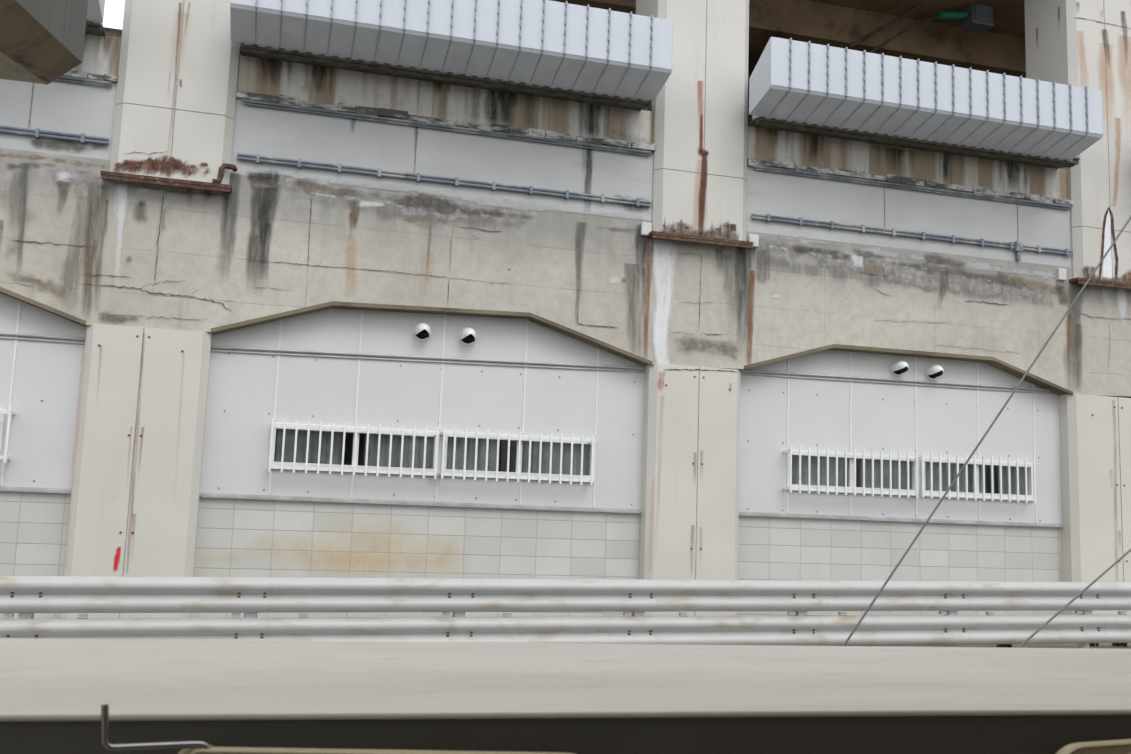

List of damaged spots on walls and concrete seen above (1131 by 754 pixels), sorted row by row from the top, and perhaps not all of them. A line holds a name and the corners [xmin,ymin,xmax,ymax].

water stain [487,90,531,123]
corrosion [114,151,208,175]
crack [14,190,231,311]
water stain [224,172,278,267]
crack [238,198,508,300]
corrosion [644,116,737,344]